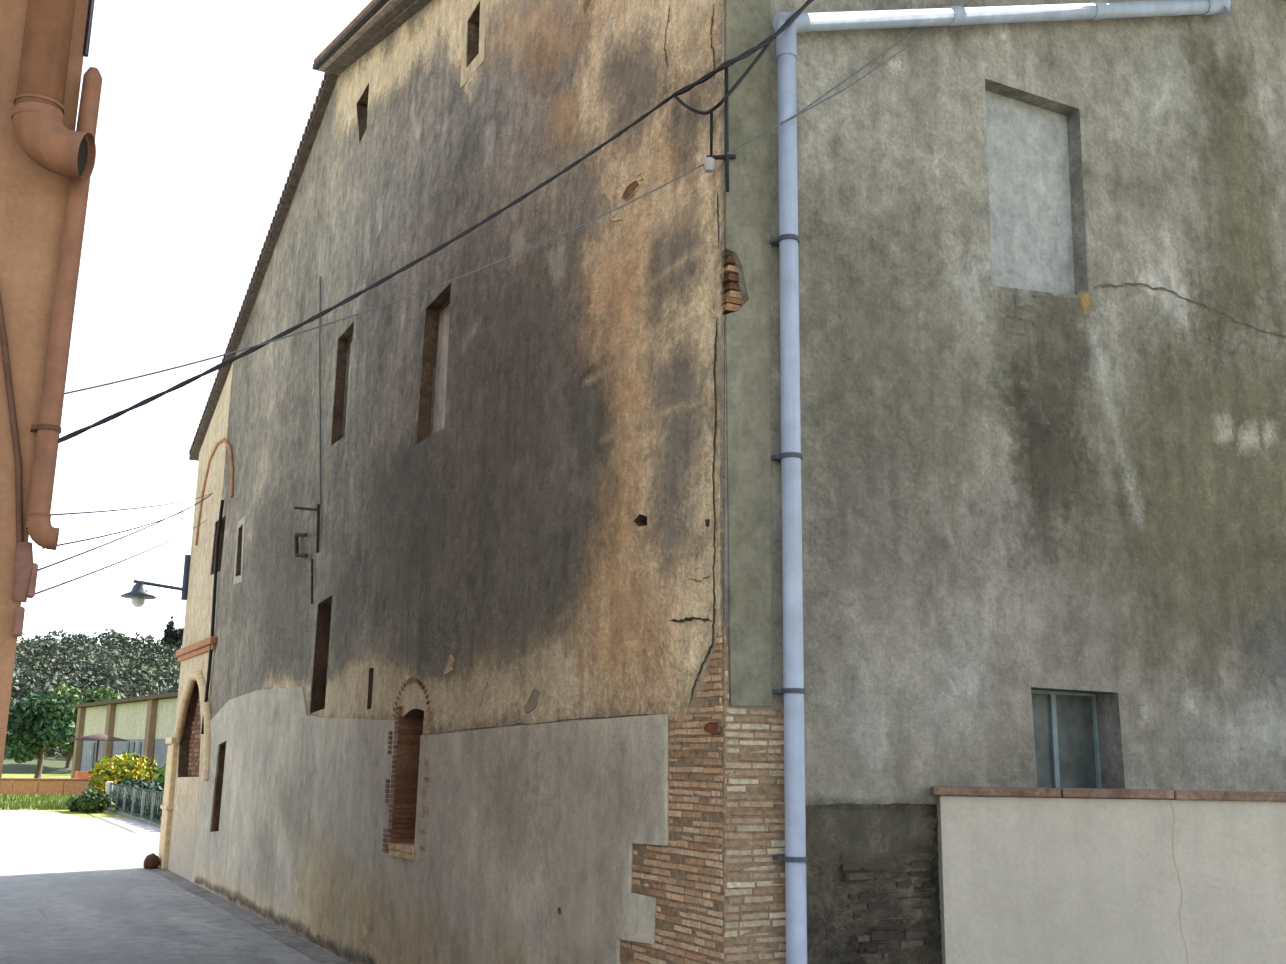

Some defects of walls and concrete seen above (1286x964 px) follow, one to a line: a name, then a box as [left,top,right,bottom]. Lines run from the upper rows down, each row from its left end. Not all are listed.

crack [708,5,716,78]
leakage [372,258,601,643]
flaking render [261,0,747,735]
leakage [651,223,698,323]
leakage [657,347,702,557]
crack [713,191,721,247]
leakage [996,287,1092,538]
crack [1094,283,1286,348]
leakage [260,509,302,657]